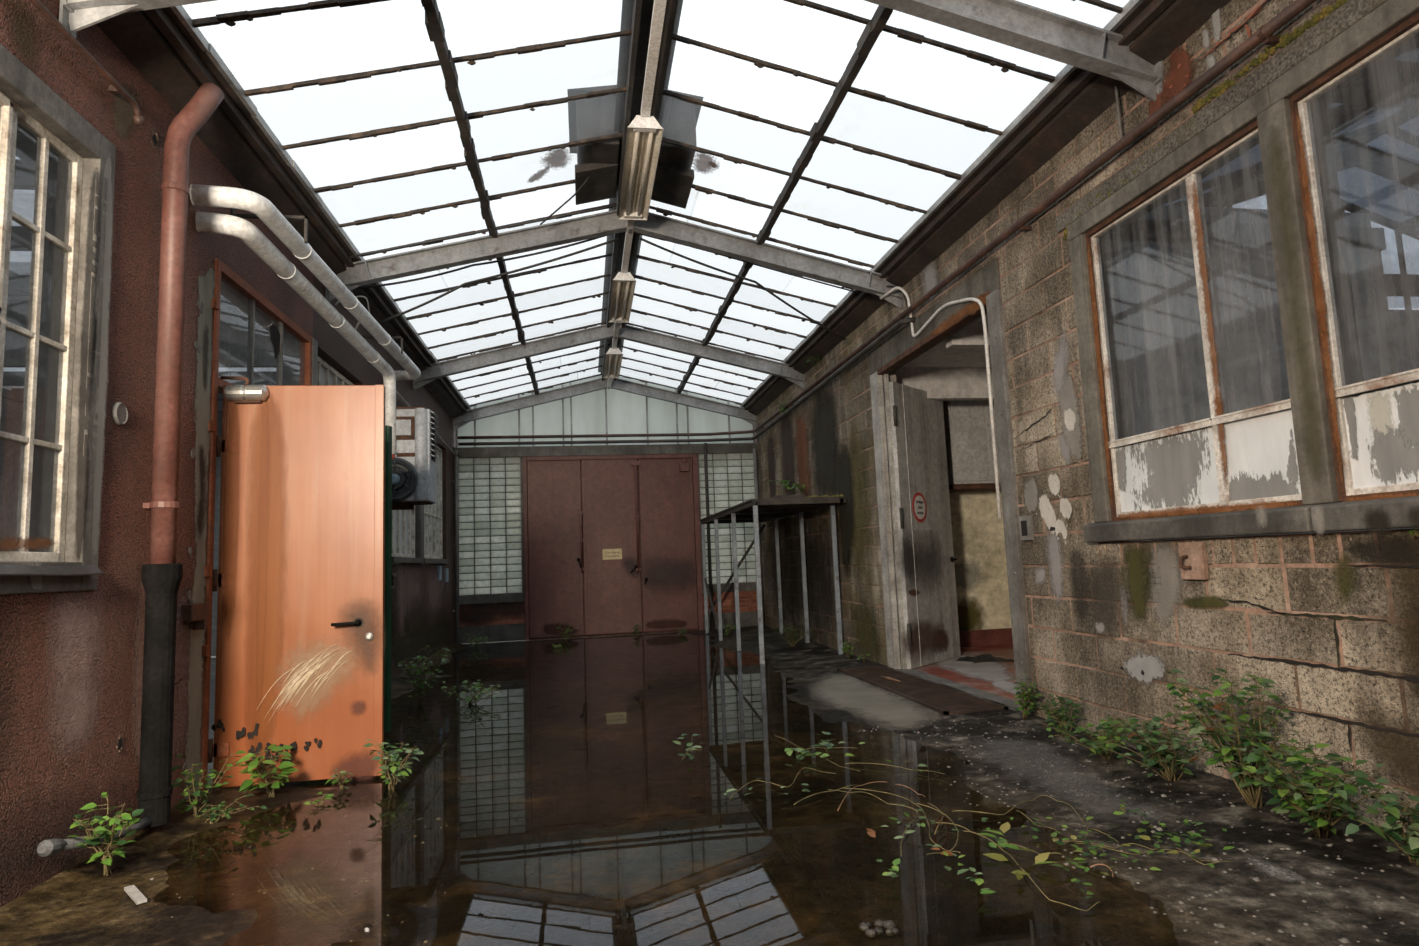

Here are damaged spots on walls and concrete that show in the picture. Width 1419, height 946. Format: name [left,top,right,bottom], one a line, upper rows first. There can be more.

leakage [1202,9,1221,68]
peeling [1064,408,1076,431]
peeling [1115,408,1301,512]
peeling [1343,382,1419,489]
peeling [1036,473,1072,544]
leakage [1313,508,1323,532]
leakage [954,563,977,588]
leakage [1151,546,1227,621]
leakage [1353,509,1419,697]
leakage [52,600,98,742]
leakage [1370,716,1419,793]
leakage [1251,859,1298,880]